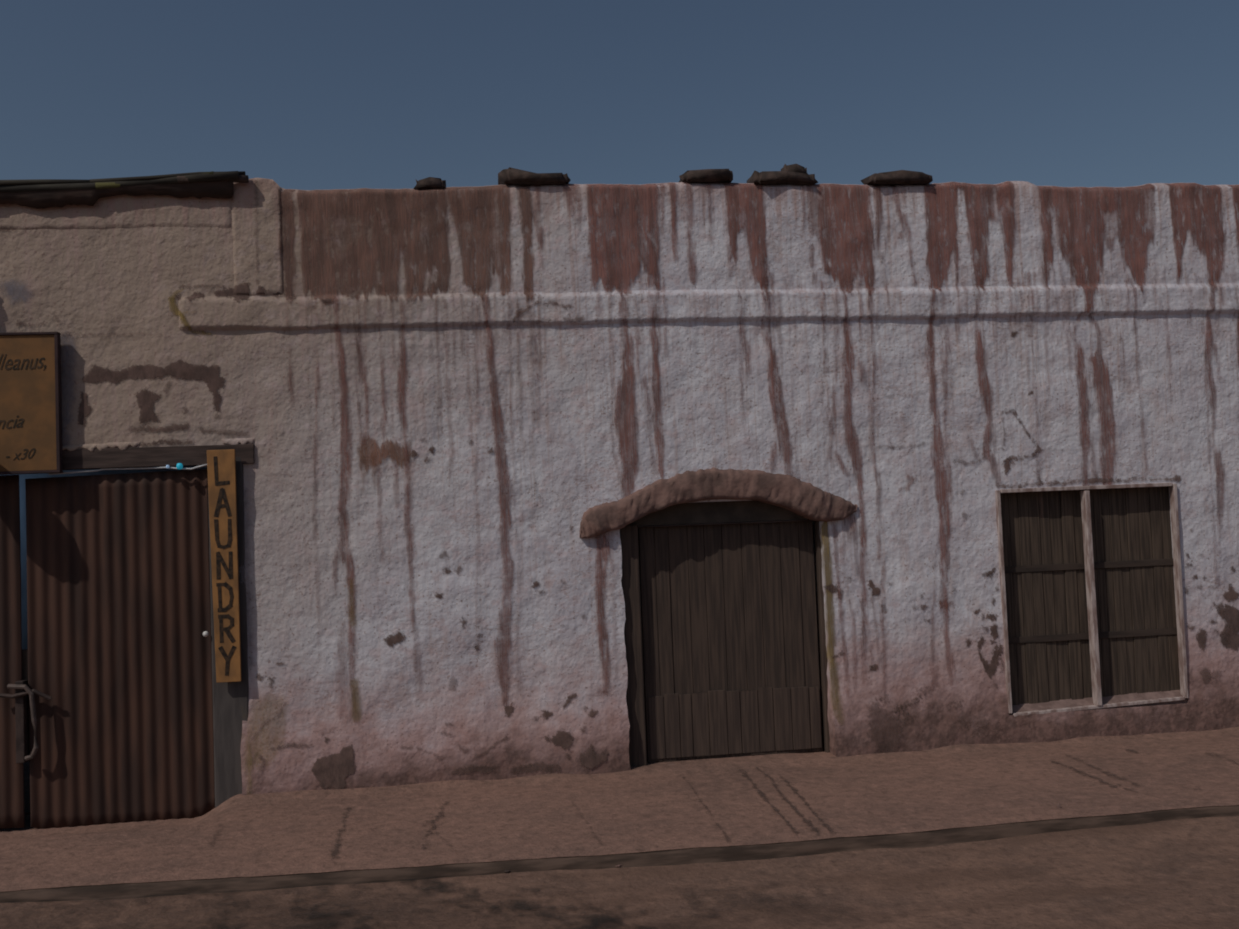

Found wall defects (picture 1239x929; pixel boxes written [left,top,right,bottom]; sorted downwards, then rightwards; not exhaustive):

peeling [78,360,225,446]
corrosion [359,437,411,470]
flaking render [966,568,1004,678]
flaking render [1187,566,1239,650]
flaking render [312,738,356,789]
flaking render [512,693,609,773]